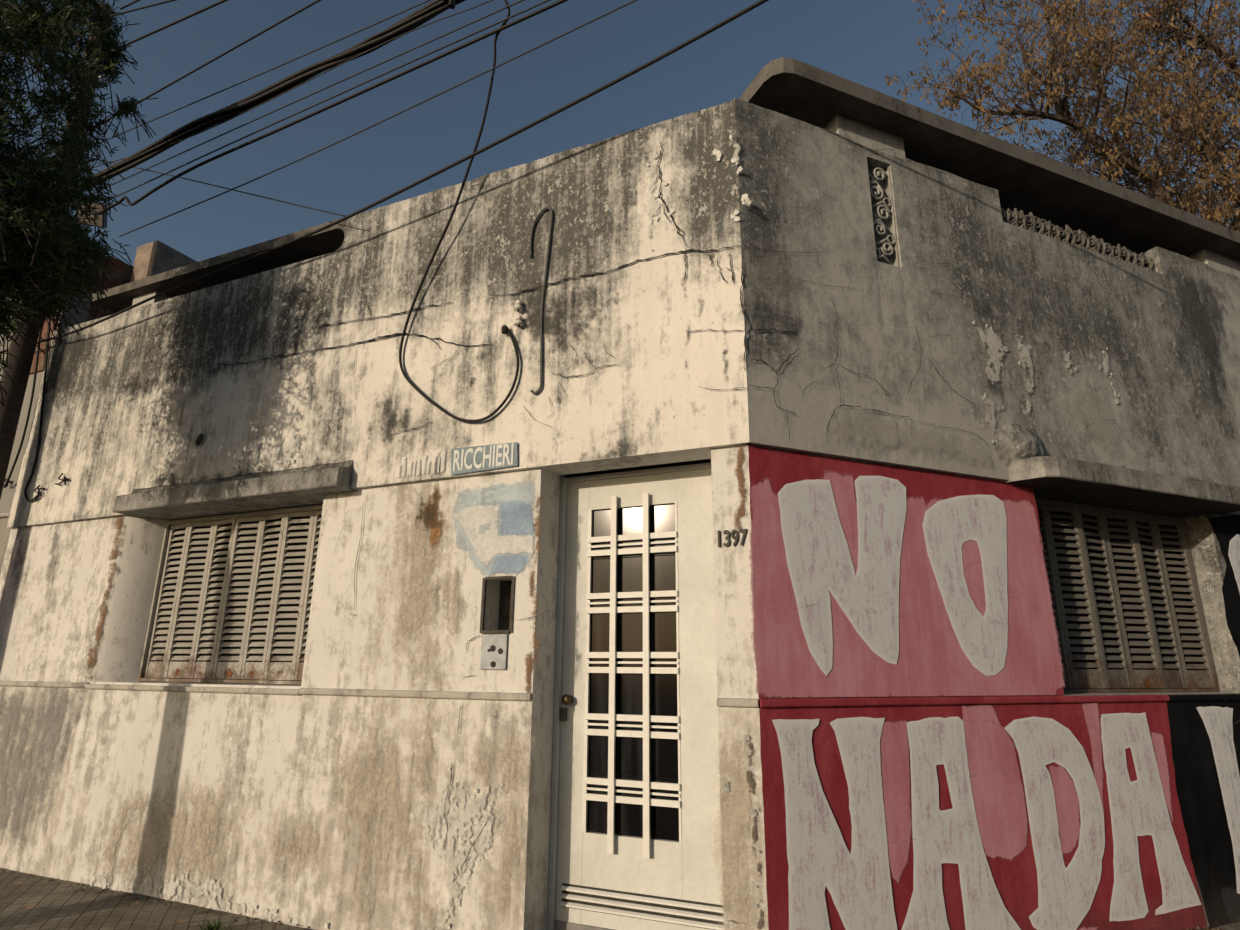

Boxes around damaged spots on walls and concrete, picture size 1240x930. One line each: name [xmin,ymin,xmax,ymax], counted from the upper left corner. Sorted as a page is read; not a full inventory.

leakage [42,328,93,398]
leakage [124,374,178,394]
crack [200,288,492,400]
leakage [369,399,408,443]
leakage [522,284,596,353]
crack [489,142,992,461]
peeling [972,320,1039,443]
leakage [1172,274,1234,437]
corrosion [415,489,443,548]
leakage [0,680,81,843]
leakage [102,788,236,880]
leakage [339,715,433,924]